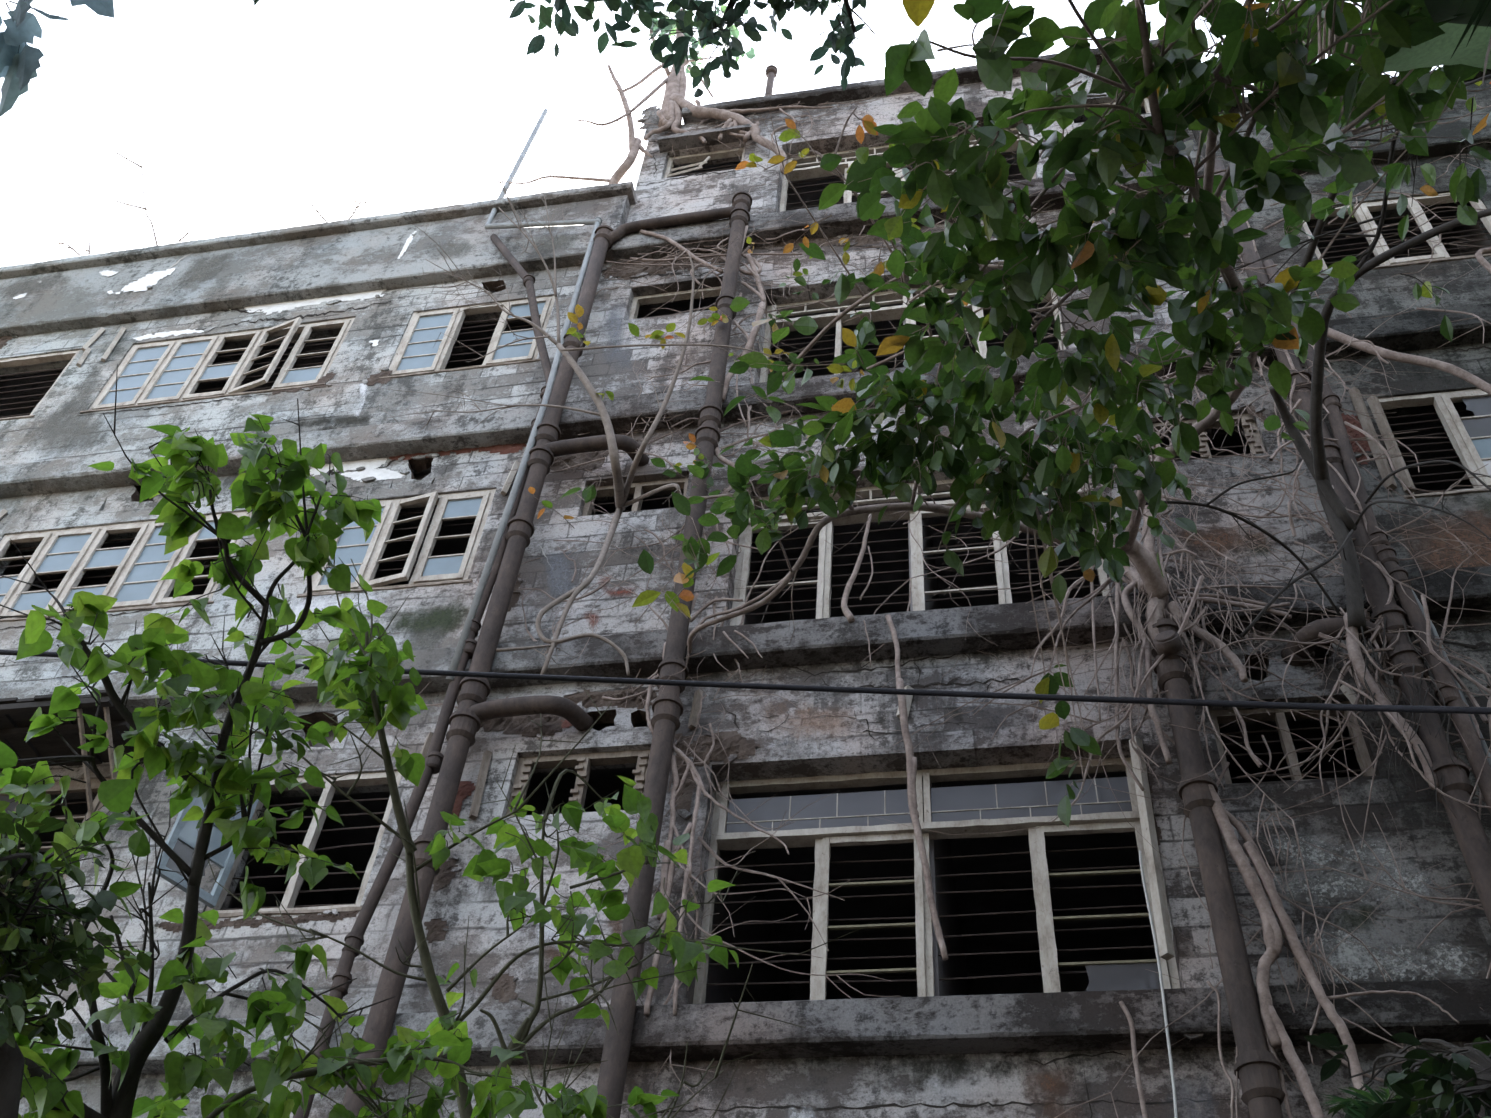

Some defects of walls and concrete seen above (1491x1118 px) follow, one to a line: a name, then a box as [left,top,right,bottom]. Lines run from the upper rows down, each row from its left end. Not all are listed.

peeling [99,268,175,294]
crack [640,1051,1241,1118]